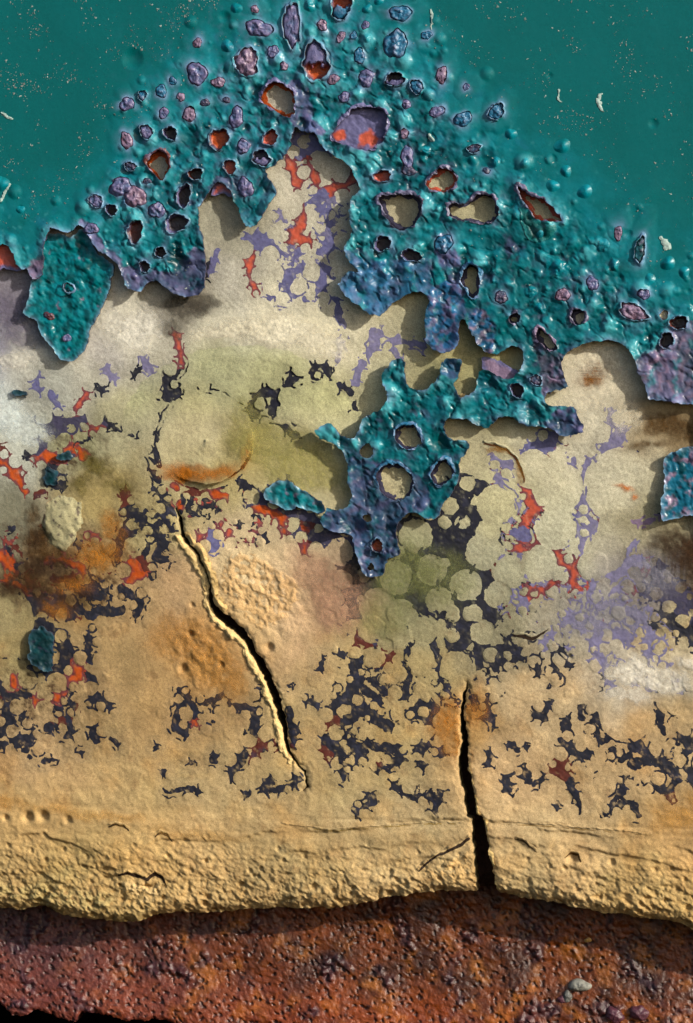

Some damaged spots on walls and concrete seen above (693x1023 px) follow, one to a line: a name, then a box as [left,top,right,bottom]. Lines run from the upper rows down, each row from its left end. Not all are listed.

peeling [0,130,693,824]
crack [175,532,294,764]
crack [282,690,652,891]
rust [0,885,693,1023]